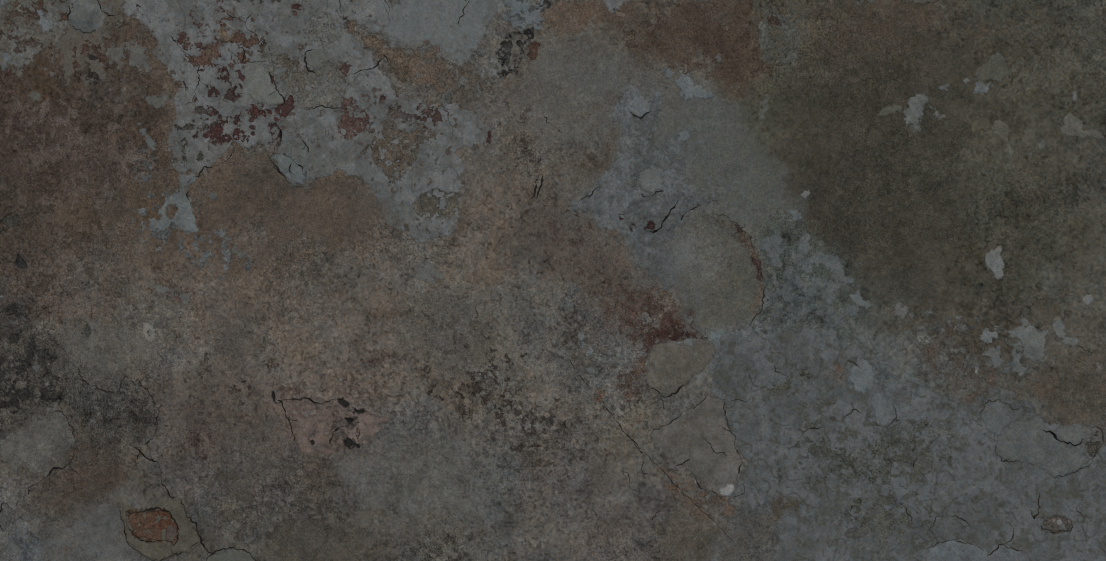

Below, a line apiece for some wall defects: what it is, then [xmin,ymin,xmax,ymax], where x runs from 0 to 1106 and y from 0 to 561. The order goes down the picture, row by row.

peeling [0,0,562,281]
peeling [876,52,1011,134]
crack [642,190,756,256]
peeling [567,68,1106,561]
crack [0,410,77,530]
peeling [119,498,201,561]
crack [73,364,256,561]
spalling [271,390,390,456]
crack [560,345,786,536]
crack [791,405,897,456]
crack [900,399,1104,556]